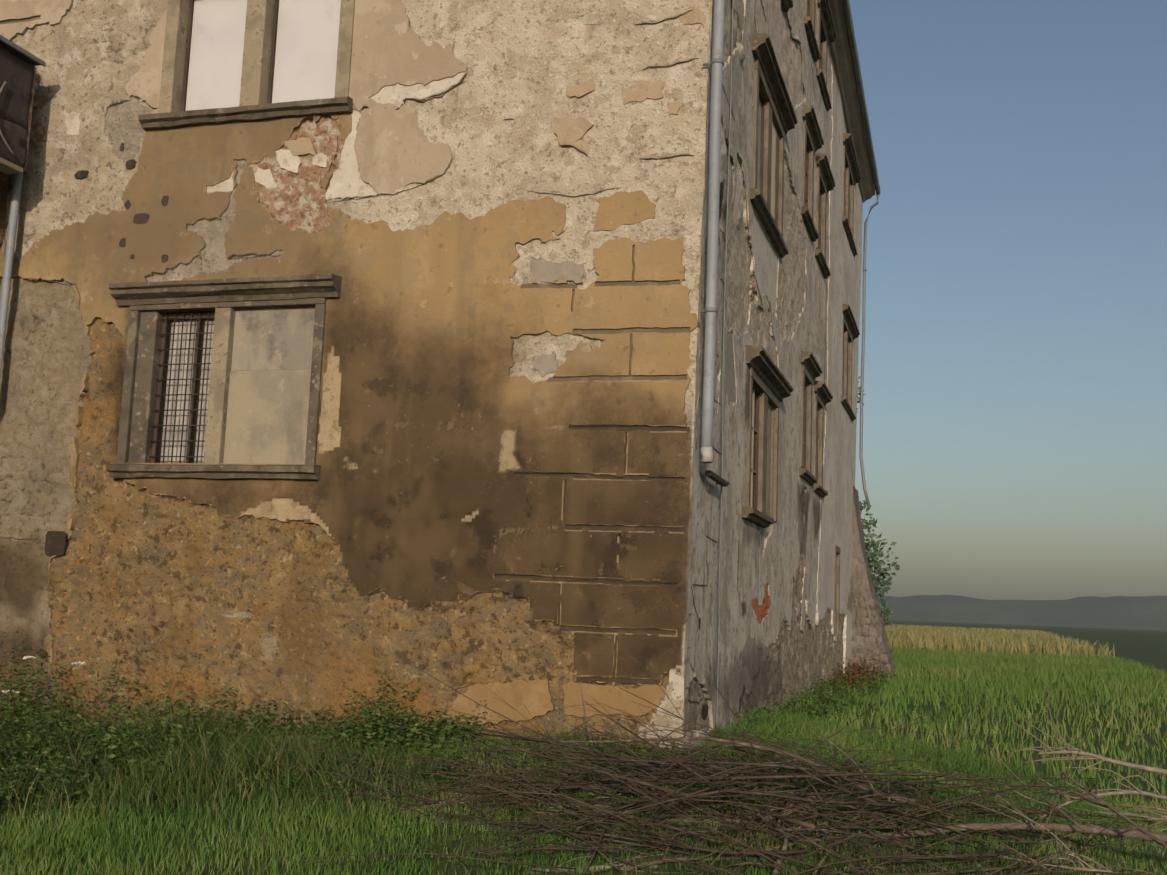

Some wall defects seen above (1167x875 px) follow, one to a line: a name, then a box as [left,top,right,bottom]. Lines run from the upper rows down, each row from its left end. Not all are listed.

crack [731,0,815,100]
crack [720,110,773,331]
flaking render [0,0,808,758]
leakage [172,293,691,684]
flaking render [738,547,845,725]